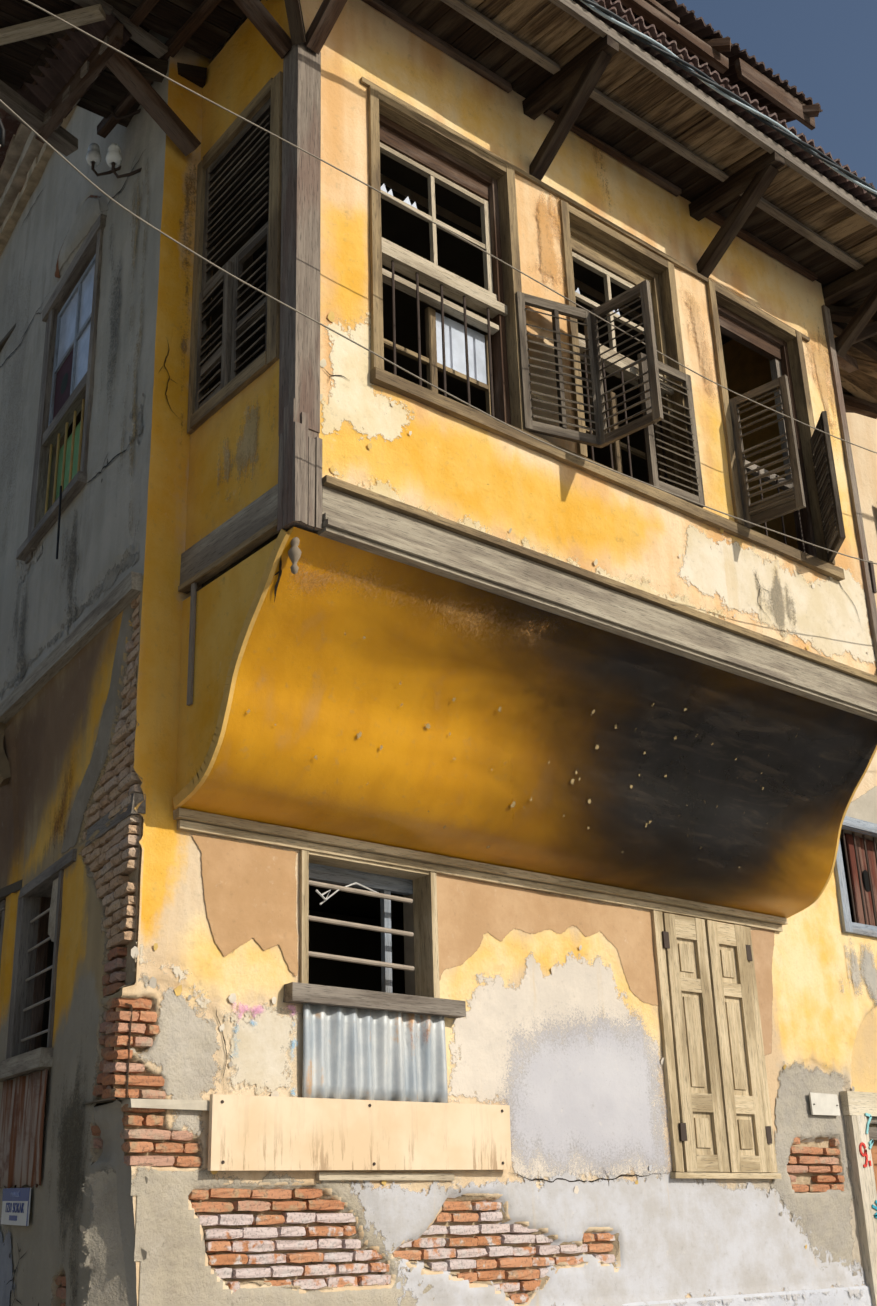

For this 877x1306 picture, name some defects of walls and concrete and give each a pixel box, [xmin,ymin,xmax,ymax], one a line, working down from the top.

crack [159,337,176,414]
peeling [320,311,415,450]
crack [86,433,142,484]
peeling [358,478,404,503]
peeling [419,505,876,666]
water stain [755,571,797,634]
peeling [38,595,867,1306]
peeling [0,1218,21,1306]